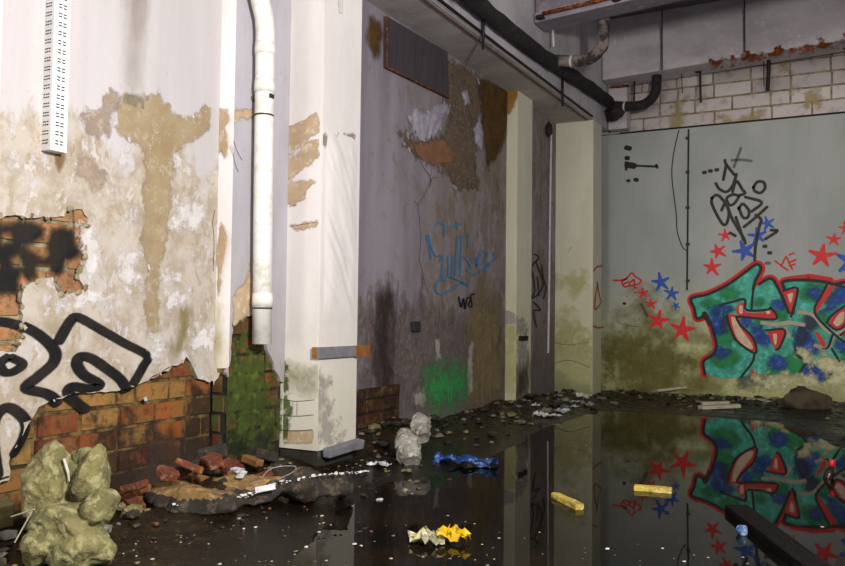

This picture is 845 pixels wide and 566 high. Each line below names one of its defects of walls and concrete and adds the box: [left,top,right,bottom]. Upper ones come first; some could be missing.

rust [709,33,845,69]
flaking render [0,205,91,352]
peeling [76,88,255,339]
peeling [292,221,318,231]
peeling [288,113,355,205]
peeling [398,60,483,192]
flaking render [0,257,345,530]